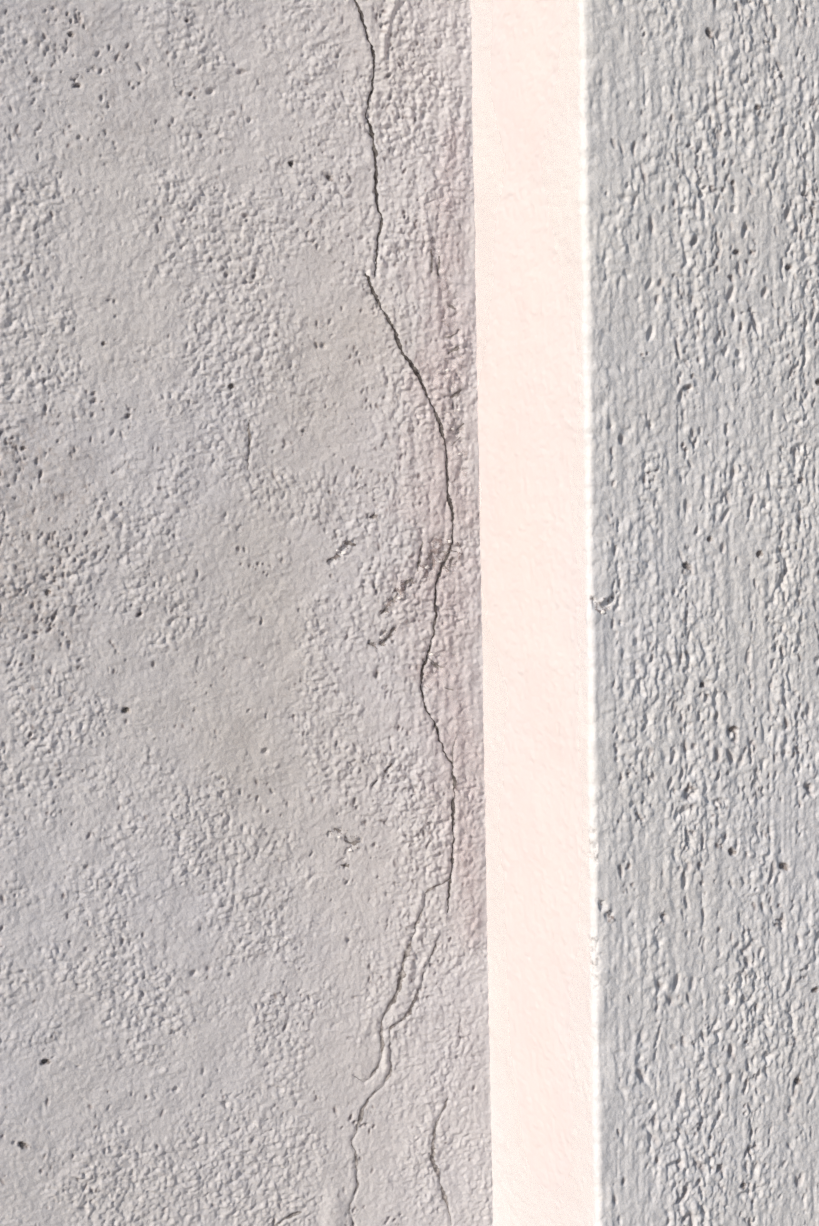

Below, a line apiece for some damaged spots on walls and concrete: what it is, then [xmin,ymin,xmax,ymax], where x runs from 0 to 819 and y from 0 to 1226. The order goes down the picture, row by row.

crack [349,0,457,1226]